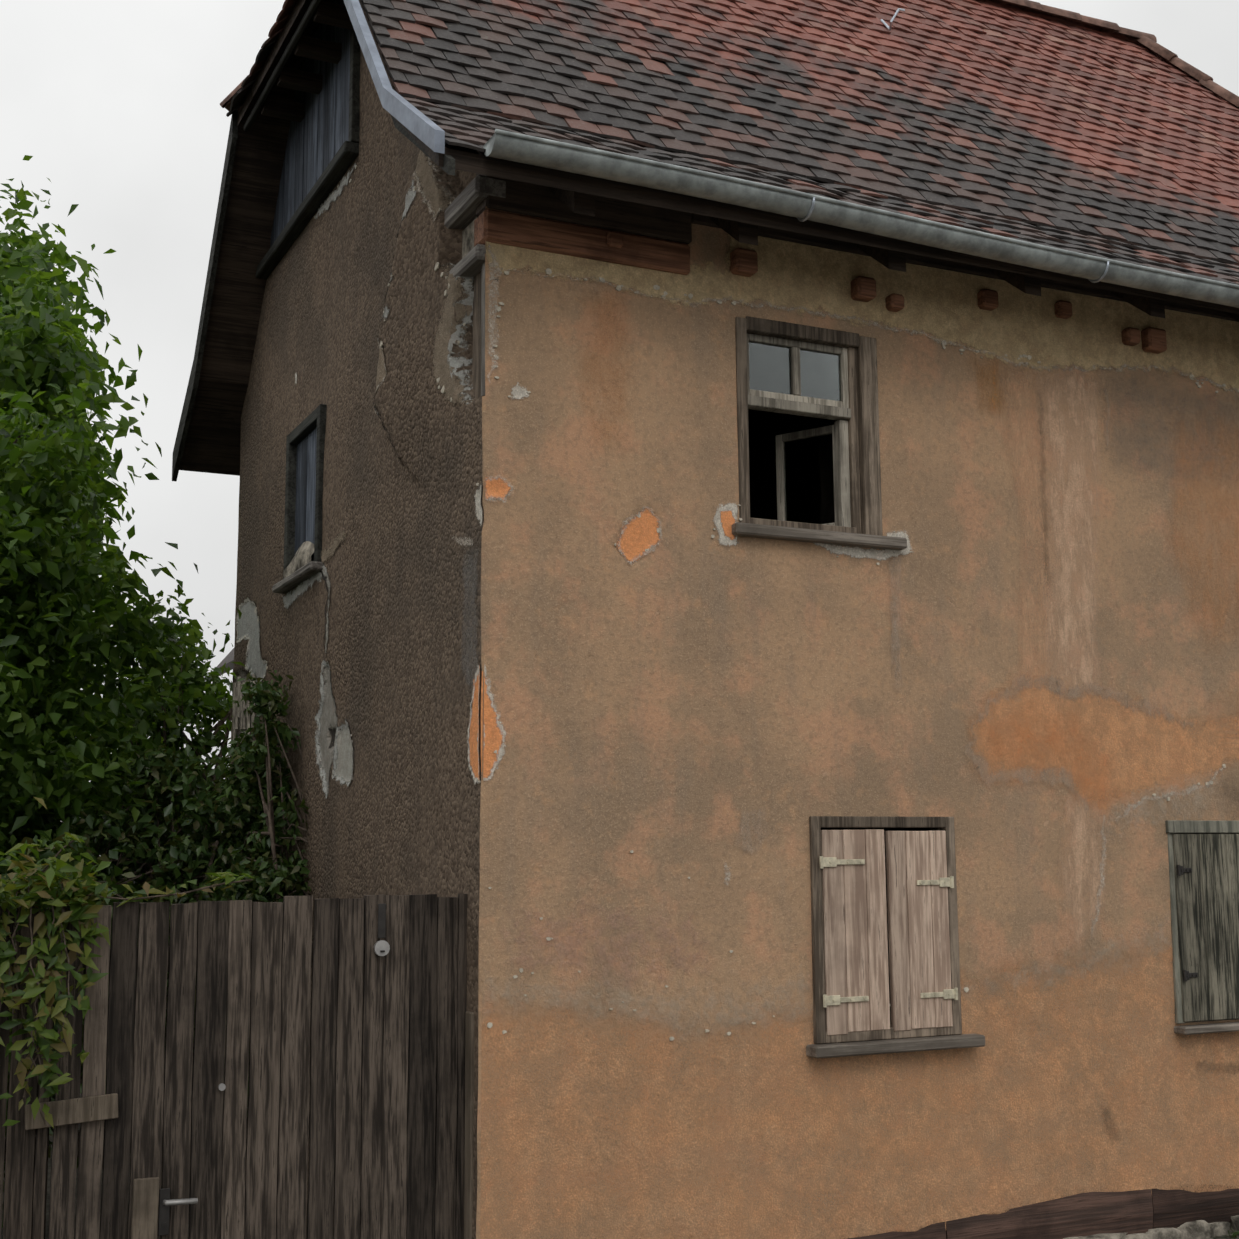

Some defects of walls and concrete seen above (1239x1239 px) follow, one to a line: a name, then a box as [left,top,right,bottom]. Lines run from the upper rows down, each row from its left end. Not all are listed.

spalling [401,150,455,222]
spalling [374,338,387,397]
spalling [432,262,475,406]
spalling [614,507,662,564]
spalling [232,598,268,741]
crack [320,569,332,656]
spalling [315,660,354,799]
spalling [467,665,506,783]